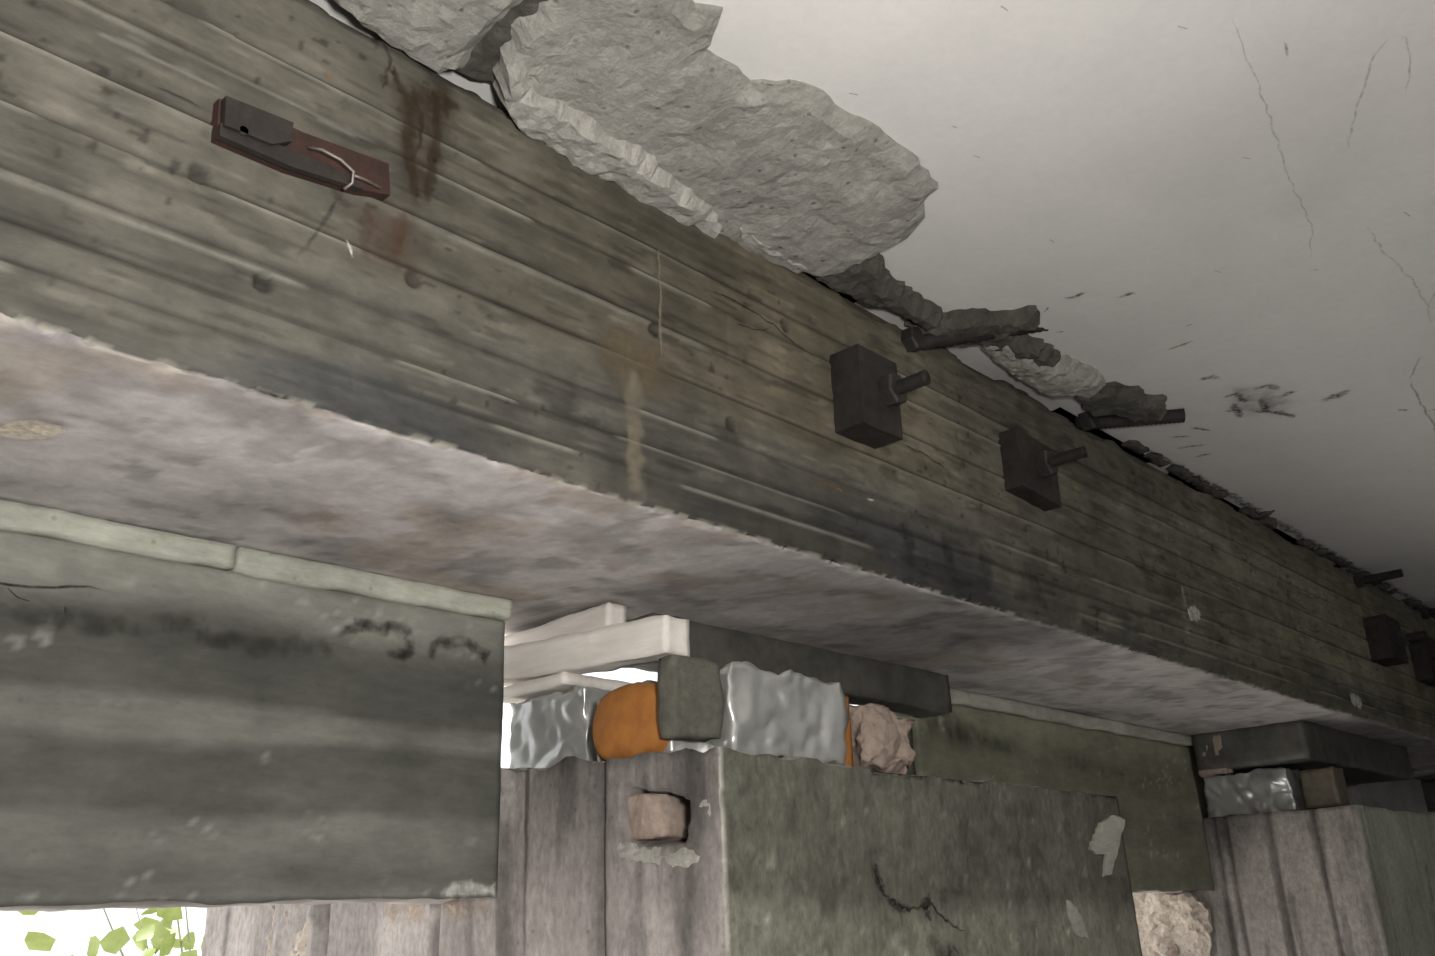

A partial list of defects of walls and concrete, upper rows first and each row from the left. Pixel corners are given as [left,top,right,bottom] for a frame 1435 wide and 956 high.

corrosion [389,61,451,196]
spalling [332,0,1168,422]
peeling [1121,440,1228,499]